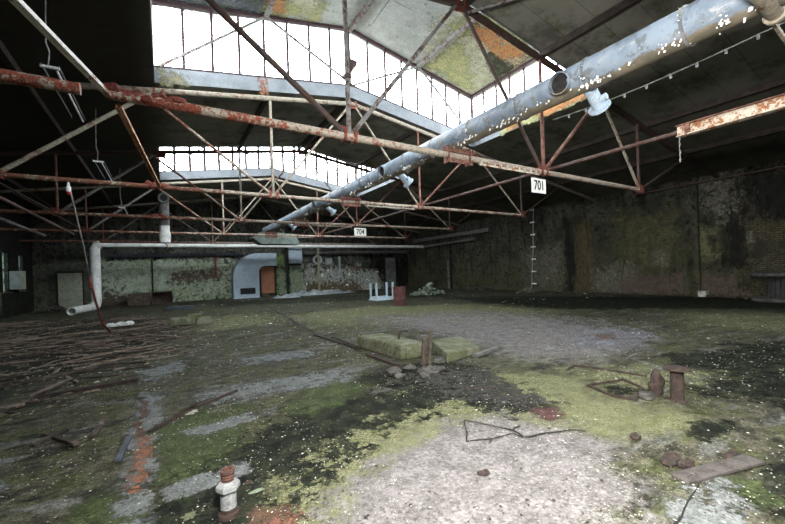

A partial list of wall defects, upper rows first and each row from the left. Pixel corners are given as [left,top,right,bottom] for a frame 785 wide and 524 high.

leakage [152,0,321,22]
leakage [423,15,535,89]
peeling [101,256,236,307]
peeling [289,261,384,293]
leakage [465,217,785,310]
rust [124,401,153,493]
leakage [62,360,736,524]